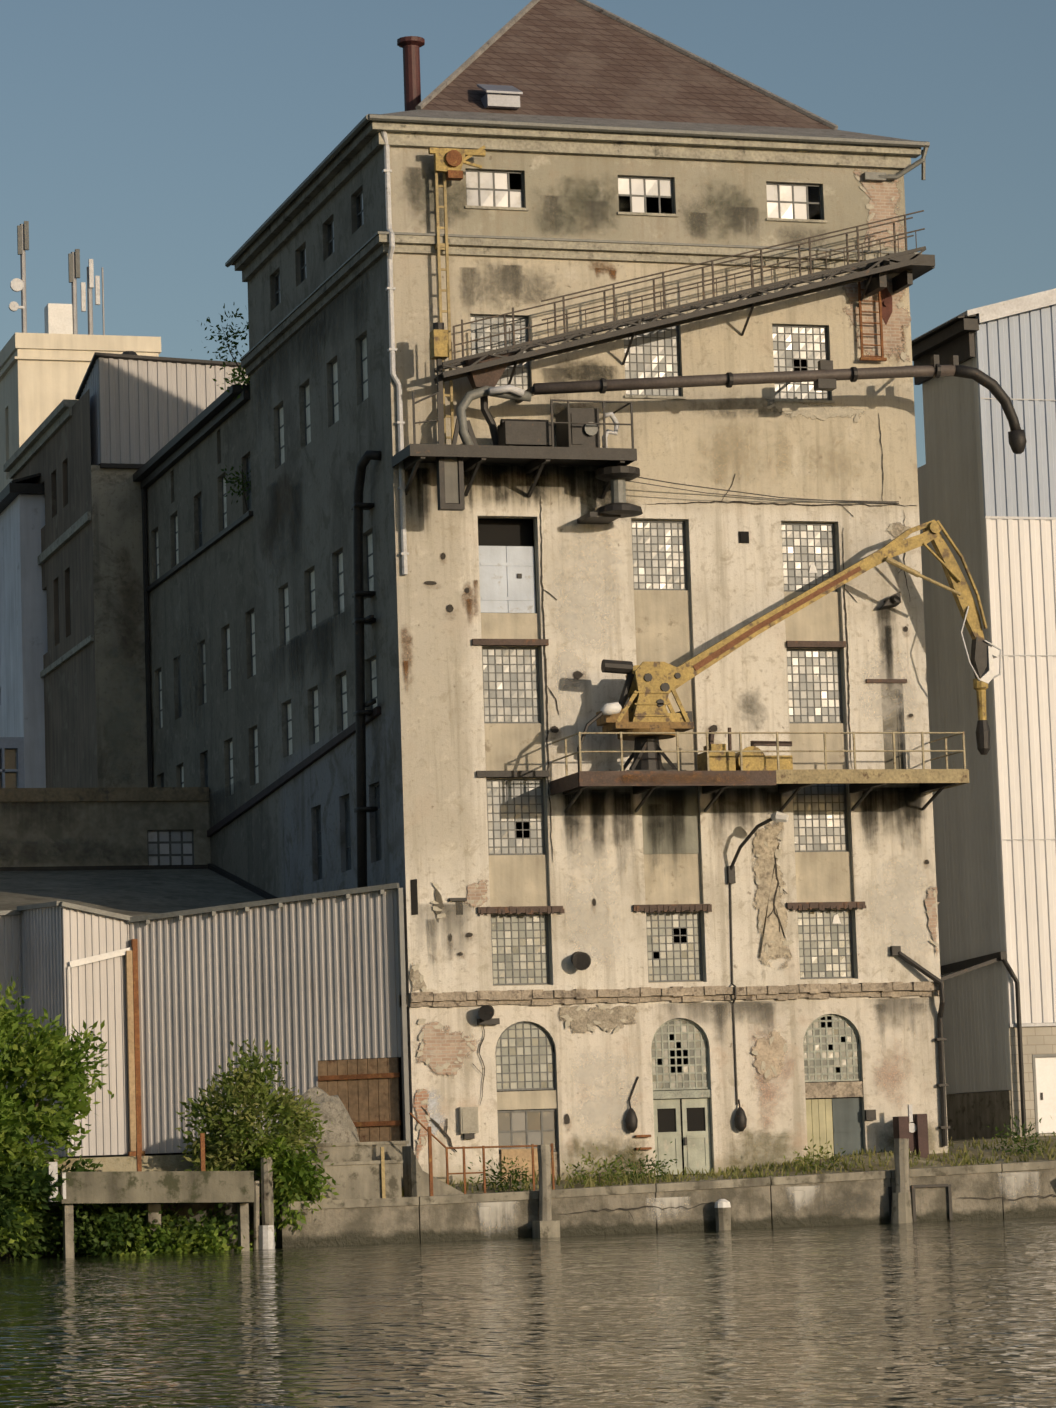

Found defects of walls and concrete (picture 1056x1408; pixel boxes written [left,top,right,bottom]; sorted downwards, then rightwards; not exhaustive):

leakage [689,194,755,228]
spalling [853,170,905,250]
spalling [843,279,911,362]
rust [403,629,411,677]
leakage [564,794,576,835]
leakage [593,793,633,832]
leakage [863,792,877,830]
leakage [903,791,920,823]
crack [767,852,788,932]
spalling [410,879,473,956]
peeling [559,1004,637,1034]
spalling [417,1018,481,1076]